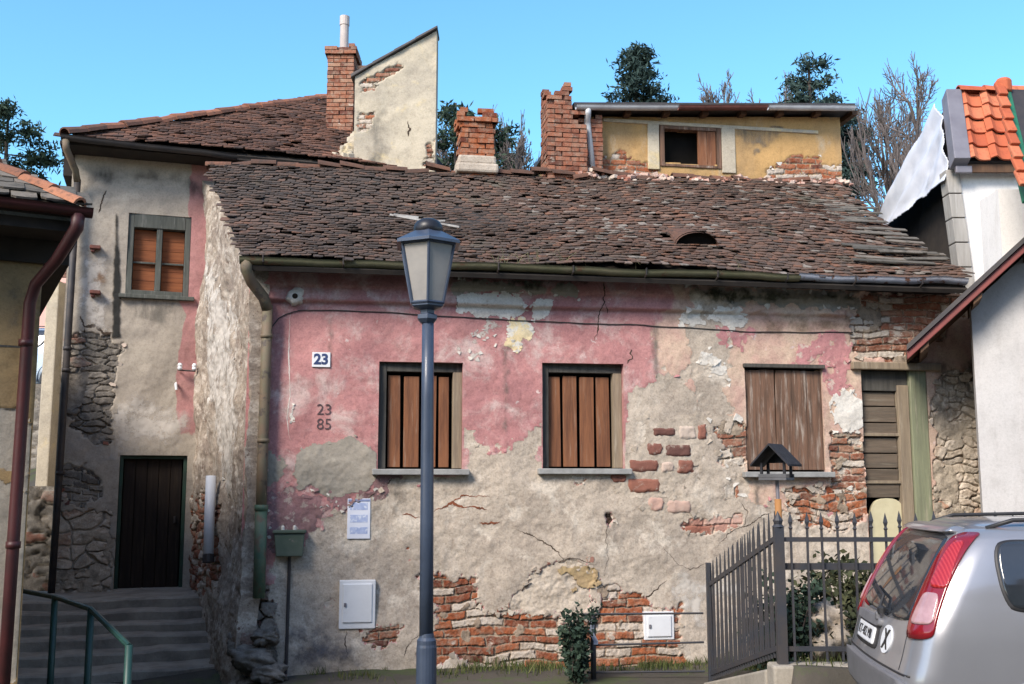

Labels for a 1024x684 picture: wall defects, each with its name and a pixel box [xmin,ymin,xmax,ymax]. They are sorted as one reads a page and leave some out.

flaking render [360,64,403,92]
peeling [766,154,842,179]
flaking render [59,260,127,445]
crack [594,283,608,341]
flaking render [55,462,115,592]
peeling [189,257,238,600]
peeling [240,475,421,676]
crack [403,494,609,587]
peeling [433,284,959,669]